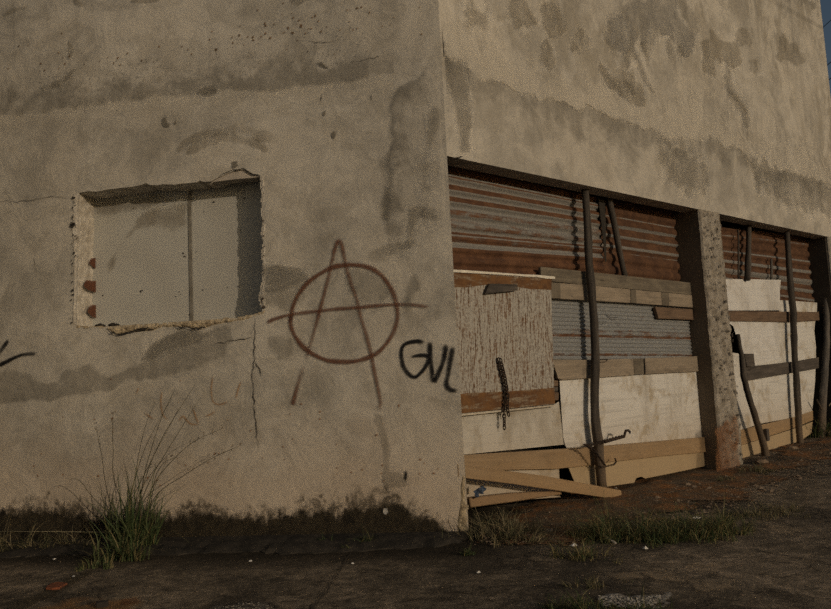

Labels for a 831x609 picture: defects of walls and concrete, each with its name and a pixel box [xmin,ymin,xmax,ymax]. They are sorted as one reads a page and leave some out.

spalling [70,161,266,335]
crack [106,325,261,448]
water stain [0,487,448,540]